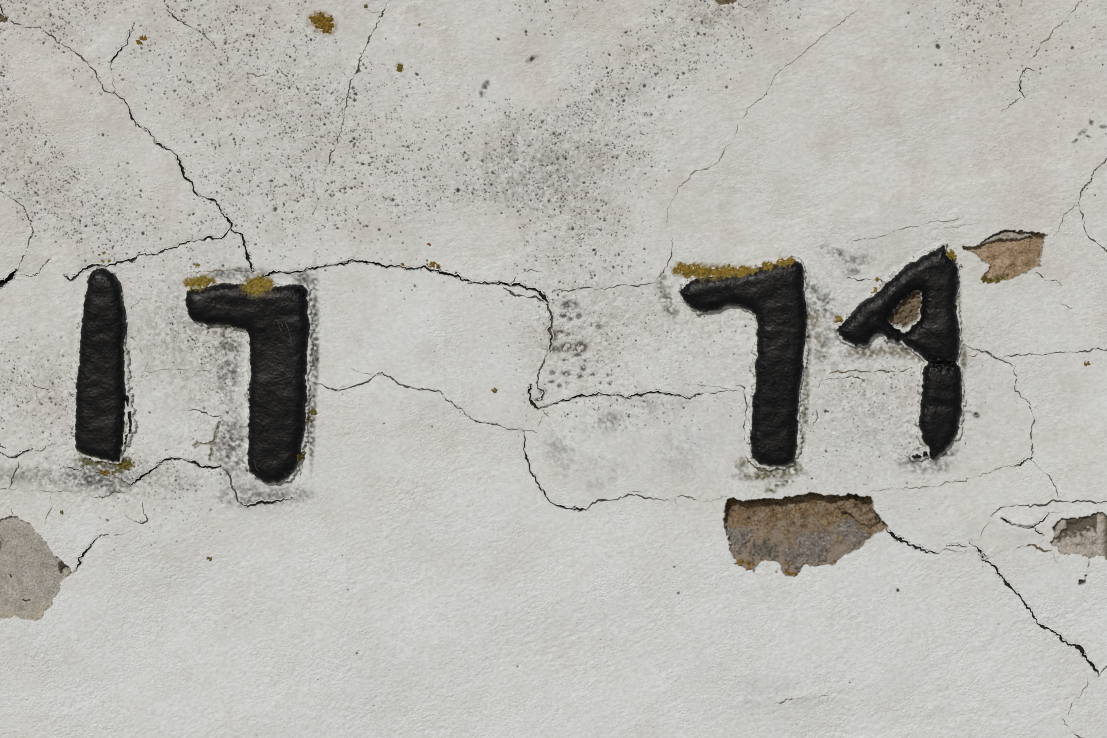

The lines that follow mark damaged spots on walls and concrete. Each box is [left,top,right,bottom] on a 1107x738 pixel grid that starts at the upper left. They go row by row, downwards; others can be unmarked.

crack [1001,0,1082,111]
crack [0,0,861,513]
crack [854,218,970,241]
spalling [962,230,1044,283]
crack [1053,158,1107,252]
crack [813,368,909,425]
spalling [0,516,73,620]
crack [0,443,304,572]
spalling [724,492,887,577]
crack [874,344,1107,738]
spalling [1050,512,1107,560]